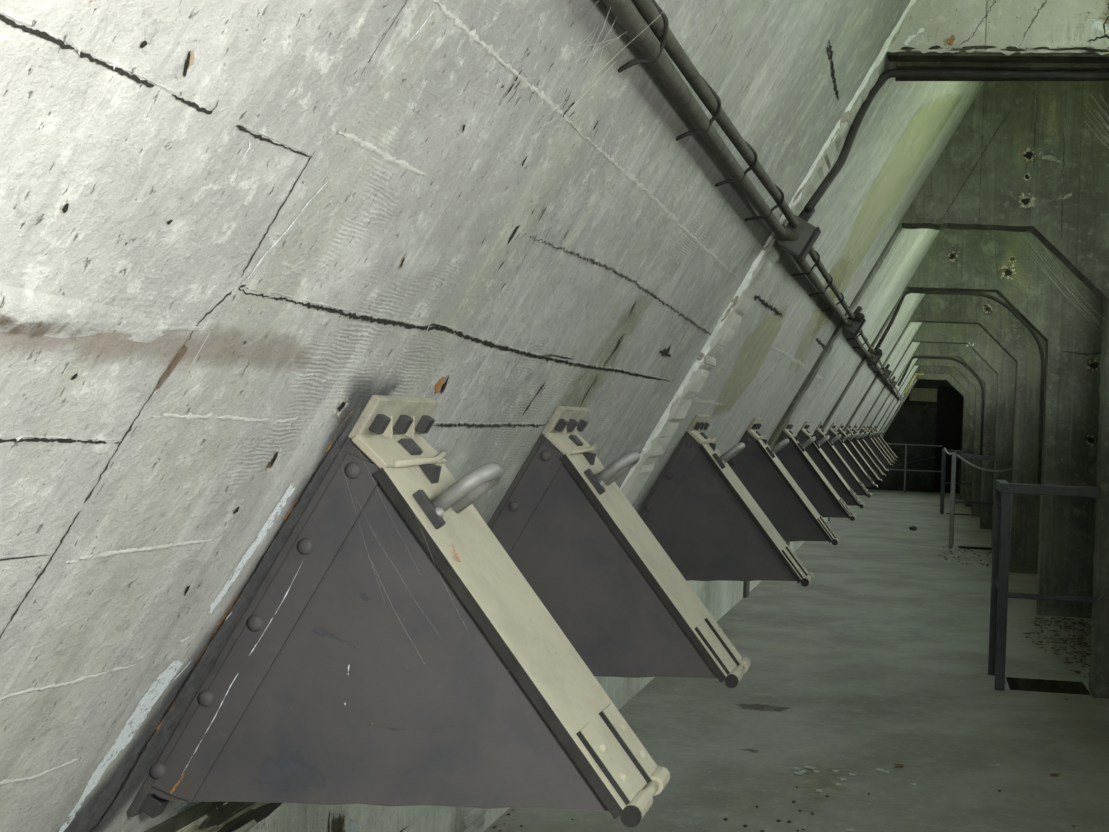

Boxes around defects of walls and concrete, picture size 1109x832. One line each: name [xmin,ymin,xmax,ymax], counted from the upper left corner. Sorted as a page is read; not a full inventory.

crack [0,10,312,157]
spalling [1018,147,1036,209]
crack [239,282,671,382]
crack [530,236,711,335]
spalling [620,0,917,490]
spalling [998,256,1016,280]
crack [0,435,122,444]
crack [0,552,51,561]